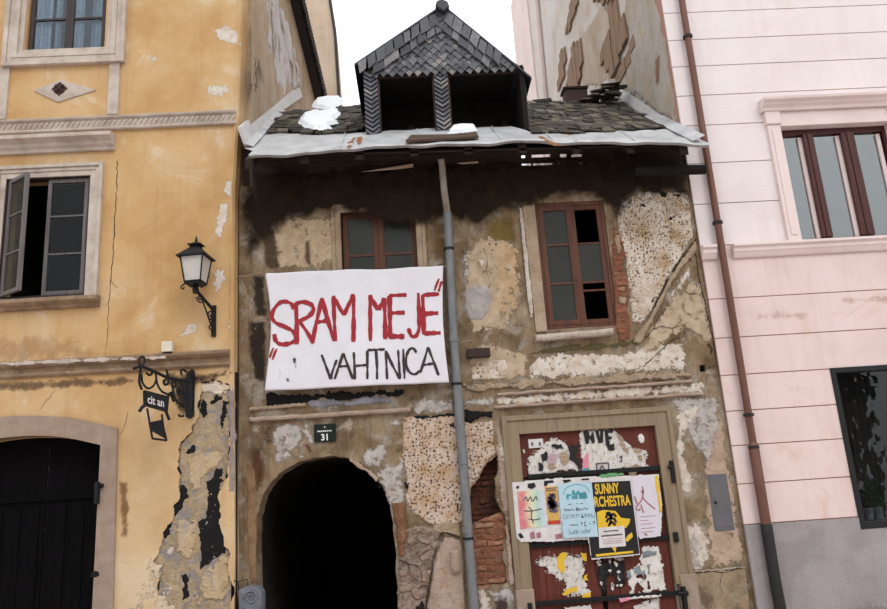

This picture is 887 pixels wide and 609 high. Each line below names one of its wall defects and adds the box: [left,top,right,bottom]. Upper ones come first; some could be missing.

peeling [215,25,242,46]
flaking render [262,0,301,97]
flaking render [582,0,677,121]
peeling [215,181,231,237]
crack [105,161,118,355]
flaking render [131,380,257,609]
peeling [350,444,387,482]
flaking render [470,440,505,525]
peeling [673,406,700,493]
peeling [687,523,712,570]